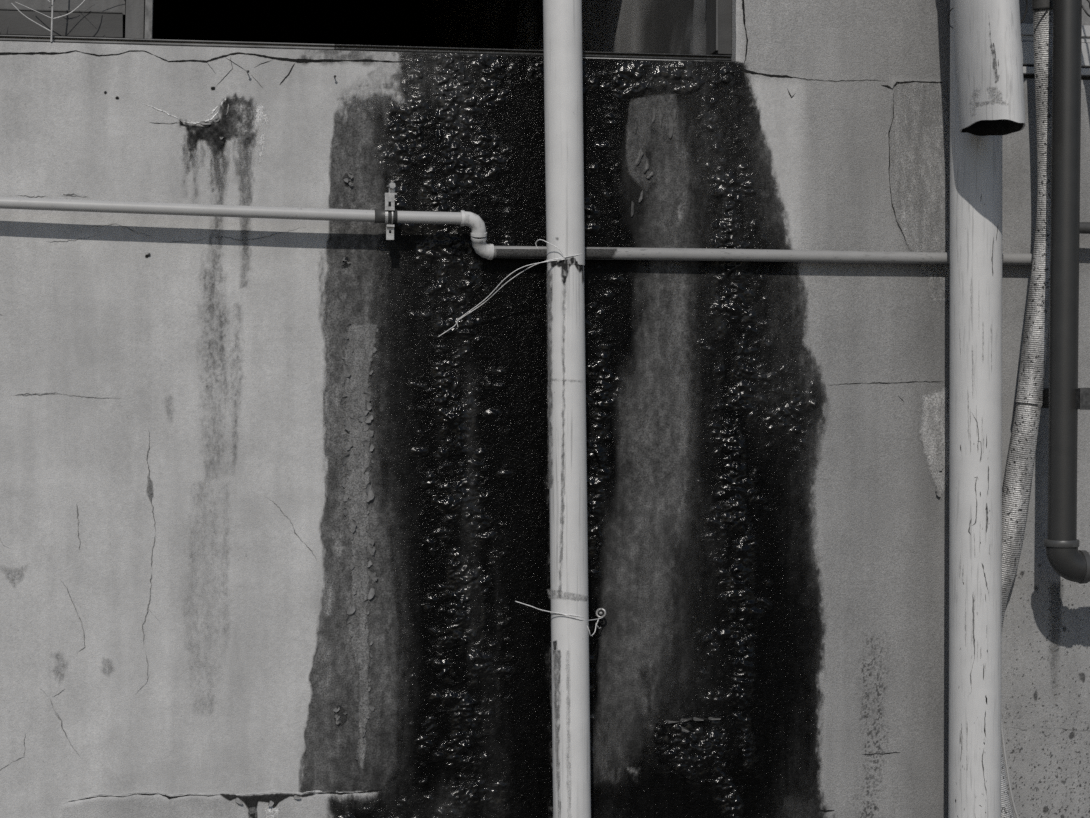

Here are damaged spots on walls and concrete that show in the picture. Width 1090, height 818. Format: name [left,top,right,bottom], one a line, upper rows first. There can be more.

crack [0,50,401,88]
leakage [204,217,236,364]
leakage [239,105,269,256]
crack [740,0,943,249]
crack [135,433,156,695]
peeling [333,324,378,769]
leakage [300,50,553,818]
leakage [582,58,826,818]
crack [69,793,214,802]
leakage [861,647,885,818]
leakage [1006,563,1090,818]